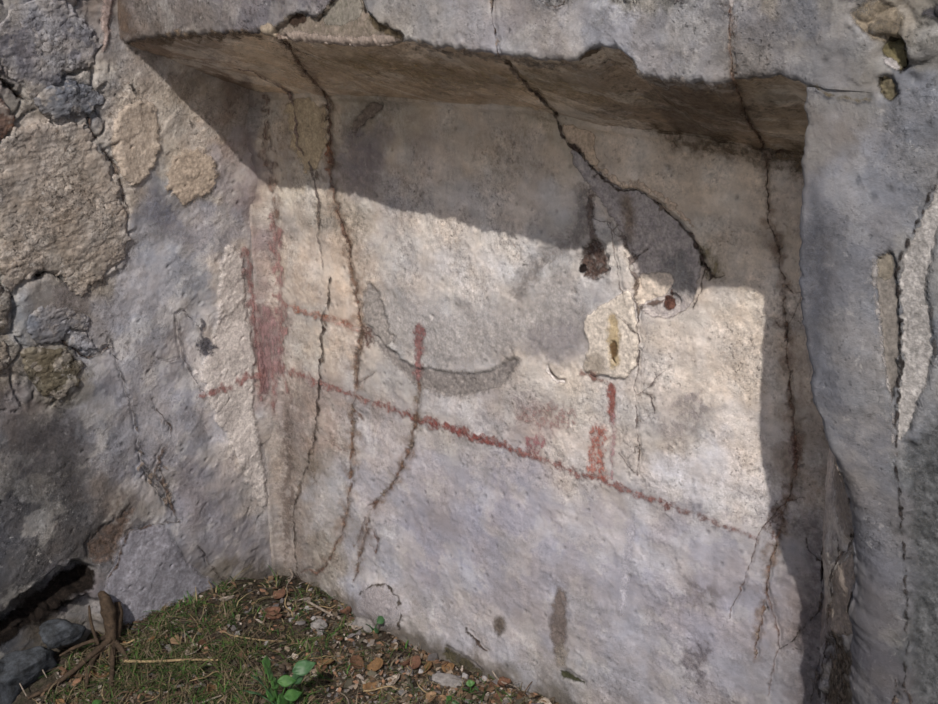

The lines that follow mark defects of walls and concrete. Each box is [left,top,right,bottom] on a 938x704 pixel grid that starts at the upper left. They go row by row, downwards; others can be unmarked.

flaking render [111,100,161,185]
flaking render [127,0,404,47]
flaking render [284,97,328,174]
crack [238,33,421,581]
flaking render [415,39,600,70]
flaking render [361,124,701,397]
crack [490,0,725,476]
crack [728,0,854,704]
flaking render [871,185,938,448]
flaking render [894,461,904,527]